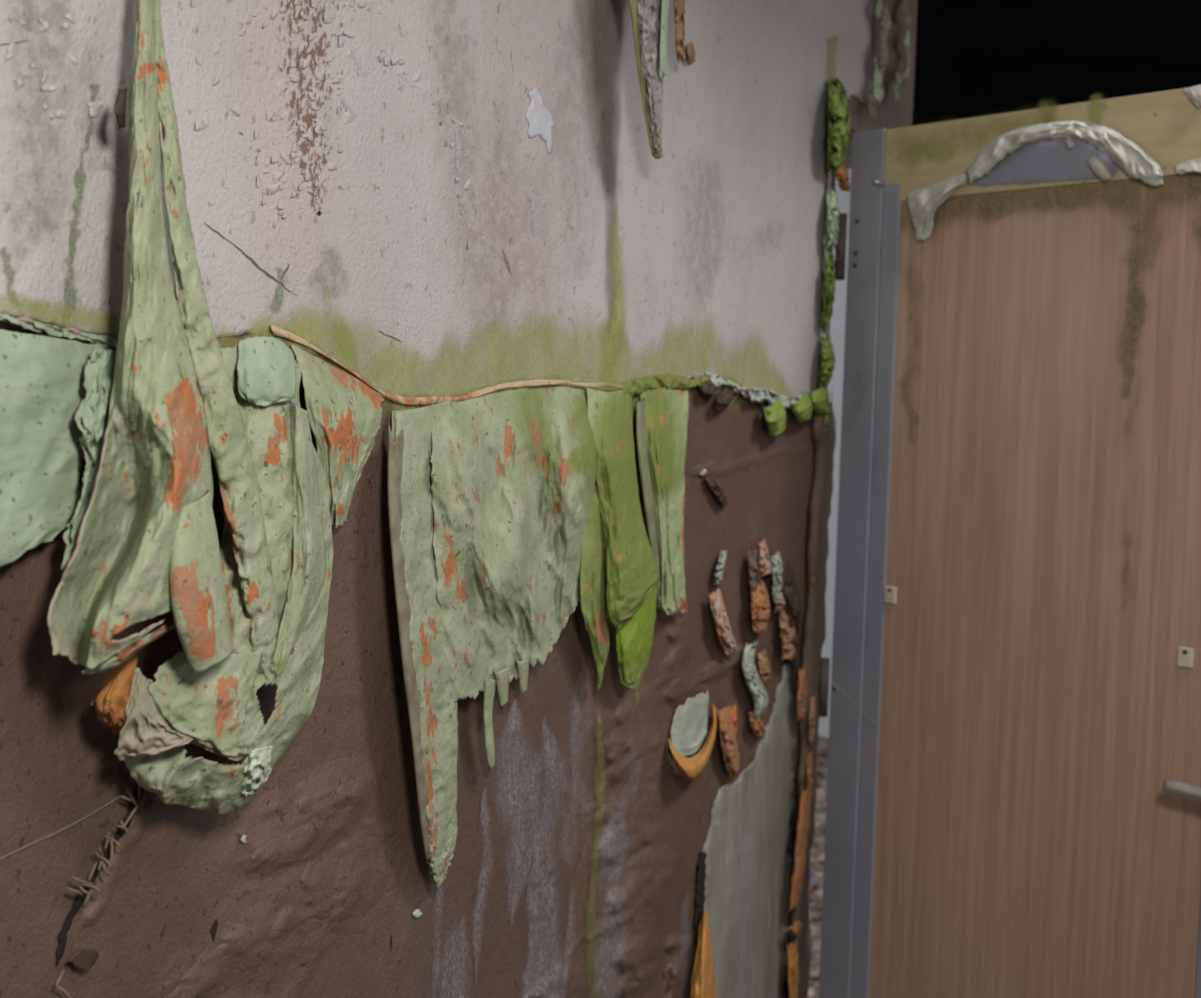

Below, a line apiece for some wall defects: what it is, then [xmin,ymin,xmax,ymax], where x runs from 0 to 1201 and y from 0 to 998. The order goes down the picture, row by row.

peeling [819,77,851,427]
peeling [868,0,911,119]
peeling [906,120,1201,241]
peeling [1182,85,1201,108]
peeling [0,0,695,889]
spalling [668,539,816,998]